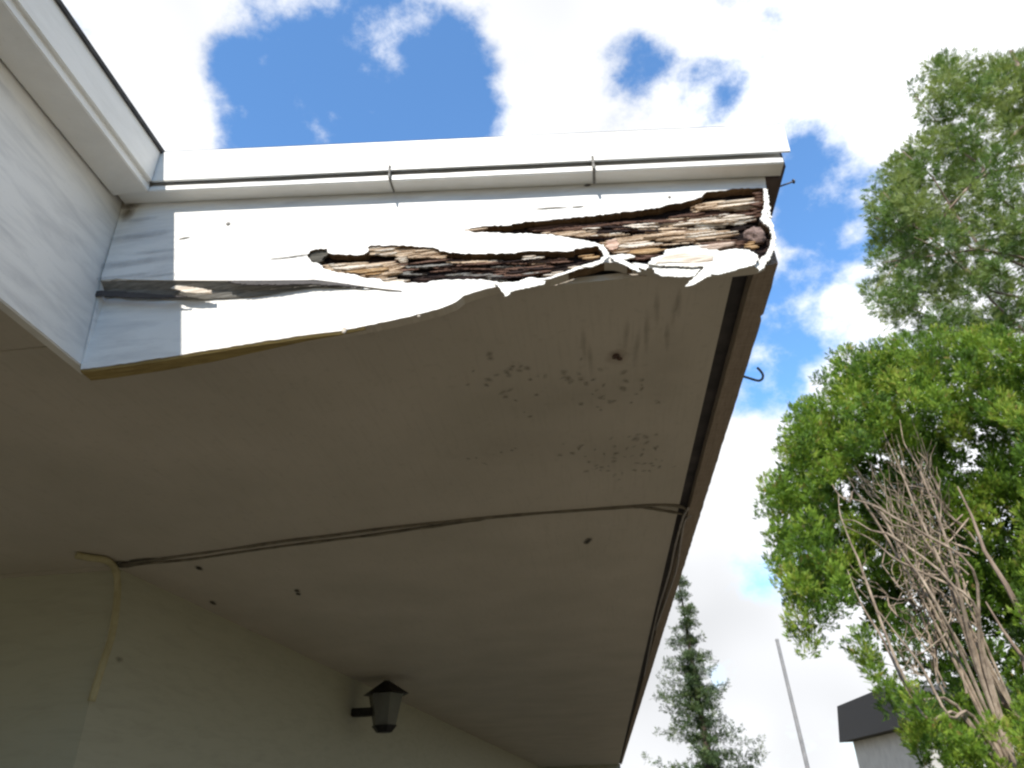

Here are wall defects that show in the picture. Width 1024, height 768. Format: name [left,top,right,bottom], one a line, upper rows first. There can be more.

spalling [308,189,776,297]